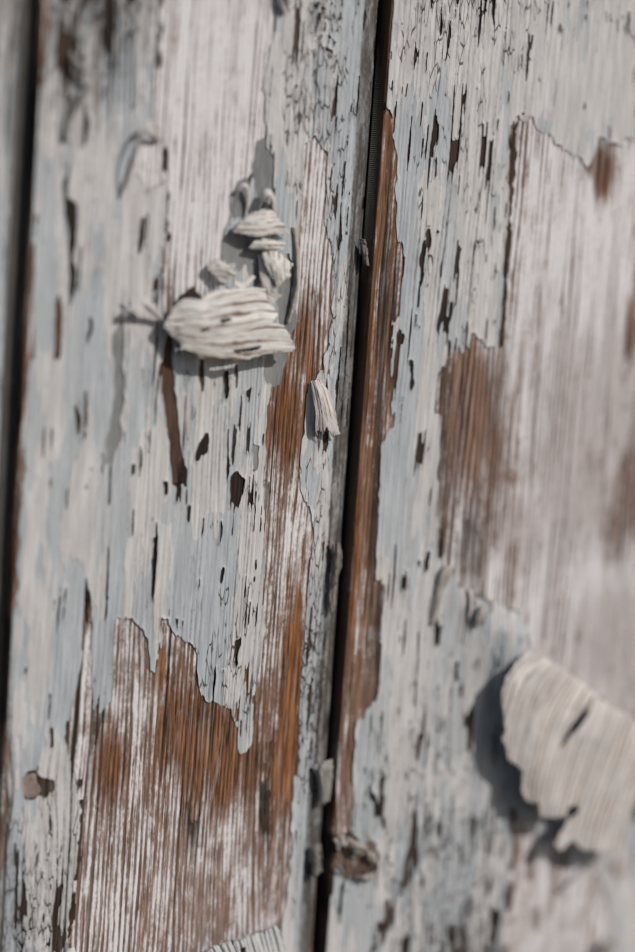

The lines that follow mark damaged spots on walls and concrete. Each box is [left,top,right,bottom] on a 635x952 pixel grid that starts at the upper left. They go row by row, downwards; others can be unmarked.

peeling [0,0,378,952]
peeling [326,0,635,952]